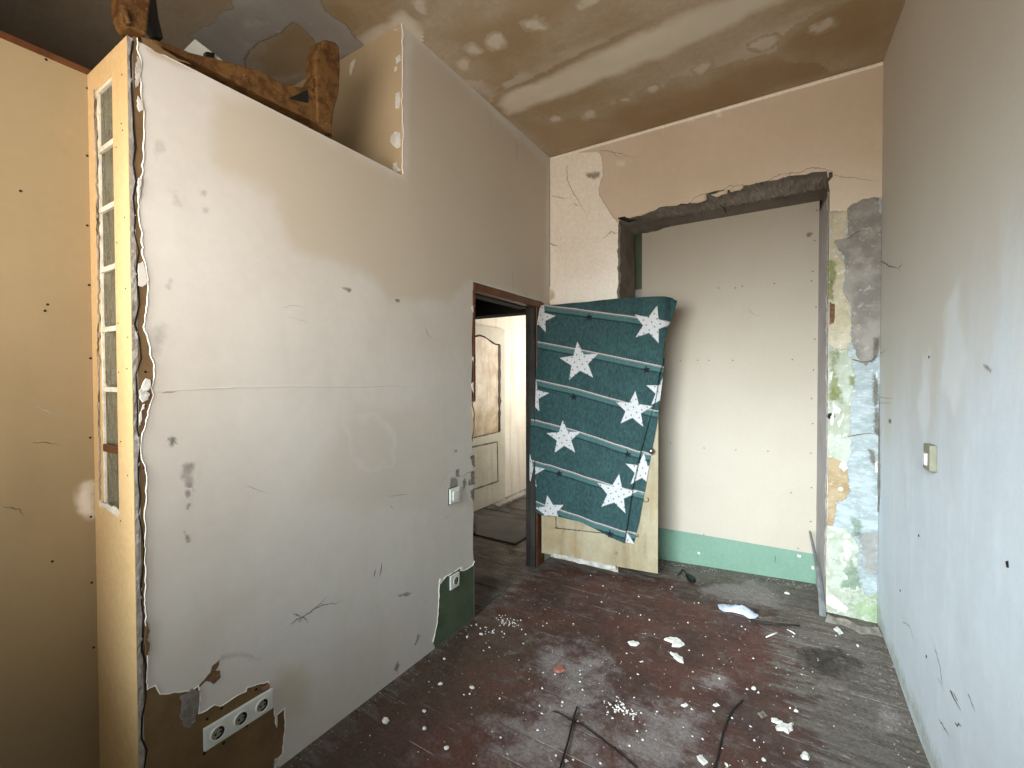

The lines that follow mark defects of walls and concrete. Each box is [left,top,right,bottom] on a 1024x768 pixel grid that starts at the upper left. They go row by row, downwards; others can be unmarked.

flaking render [188,0,370,83]
damp [196,0,906,314]
flaking render [550,152,637,305]
flaking render [137,262,148,287]
flaking render [139,378,151,424]
flaking render [812,172,882,622]
crack [291,595,339,624]
peeling [432,561,475,648]
spalling [206,670,221,684]